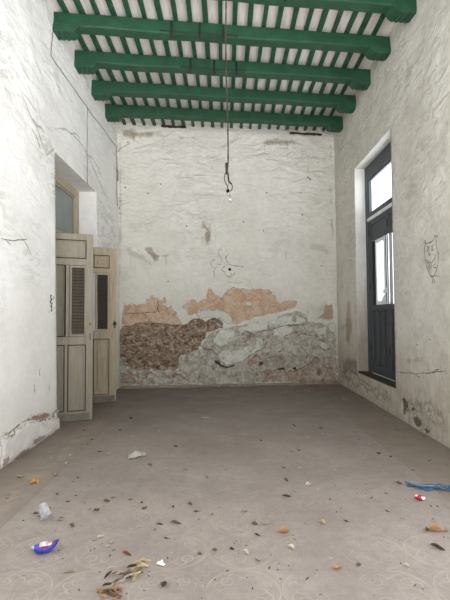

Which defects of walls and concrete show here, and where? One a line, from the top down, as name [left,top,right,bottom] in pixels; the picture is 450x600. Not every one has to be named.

flaking render [120,287,339,386]
flaking render [29,410,59,422]